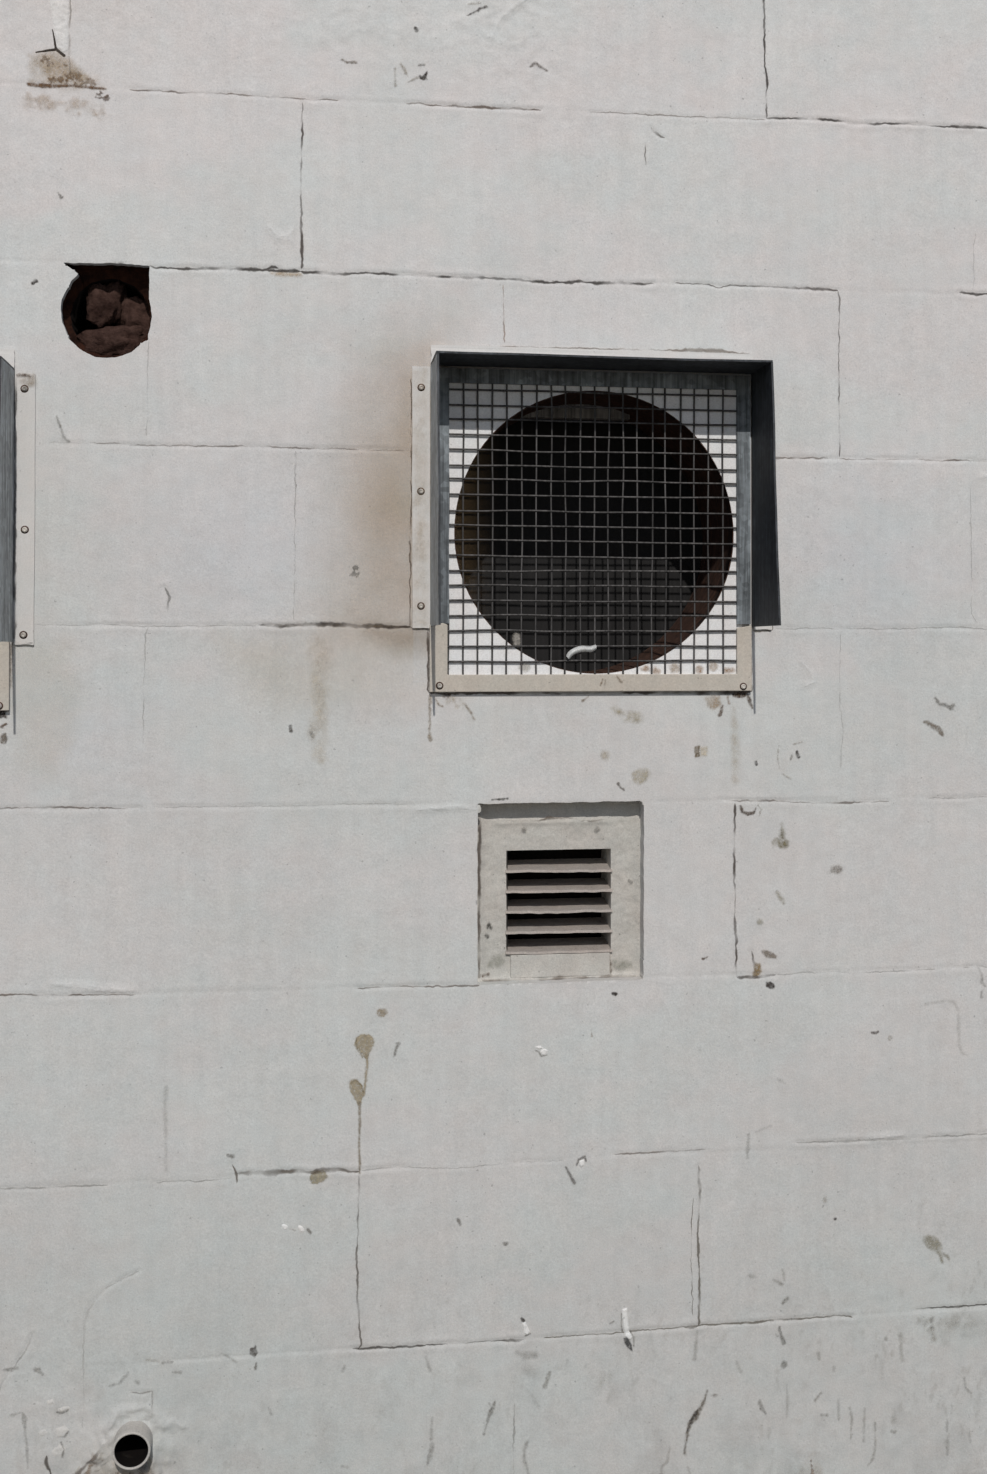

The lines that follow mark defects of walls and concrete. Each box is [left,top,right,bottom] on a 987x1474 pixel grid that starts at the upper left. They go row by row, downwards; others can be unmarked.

peeling [27,0,109,108]
water stain [350,1034,374,1173]